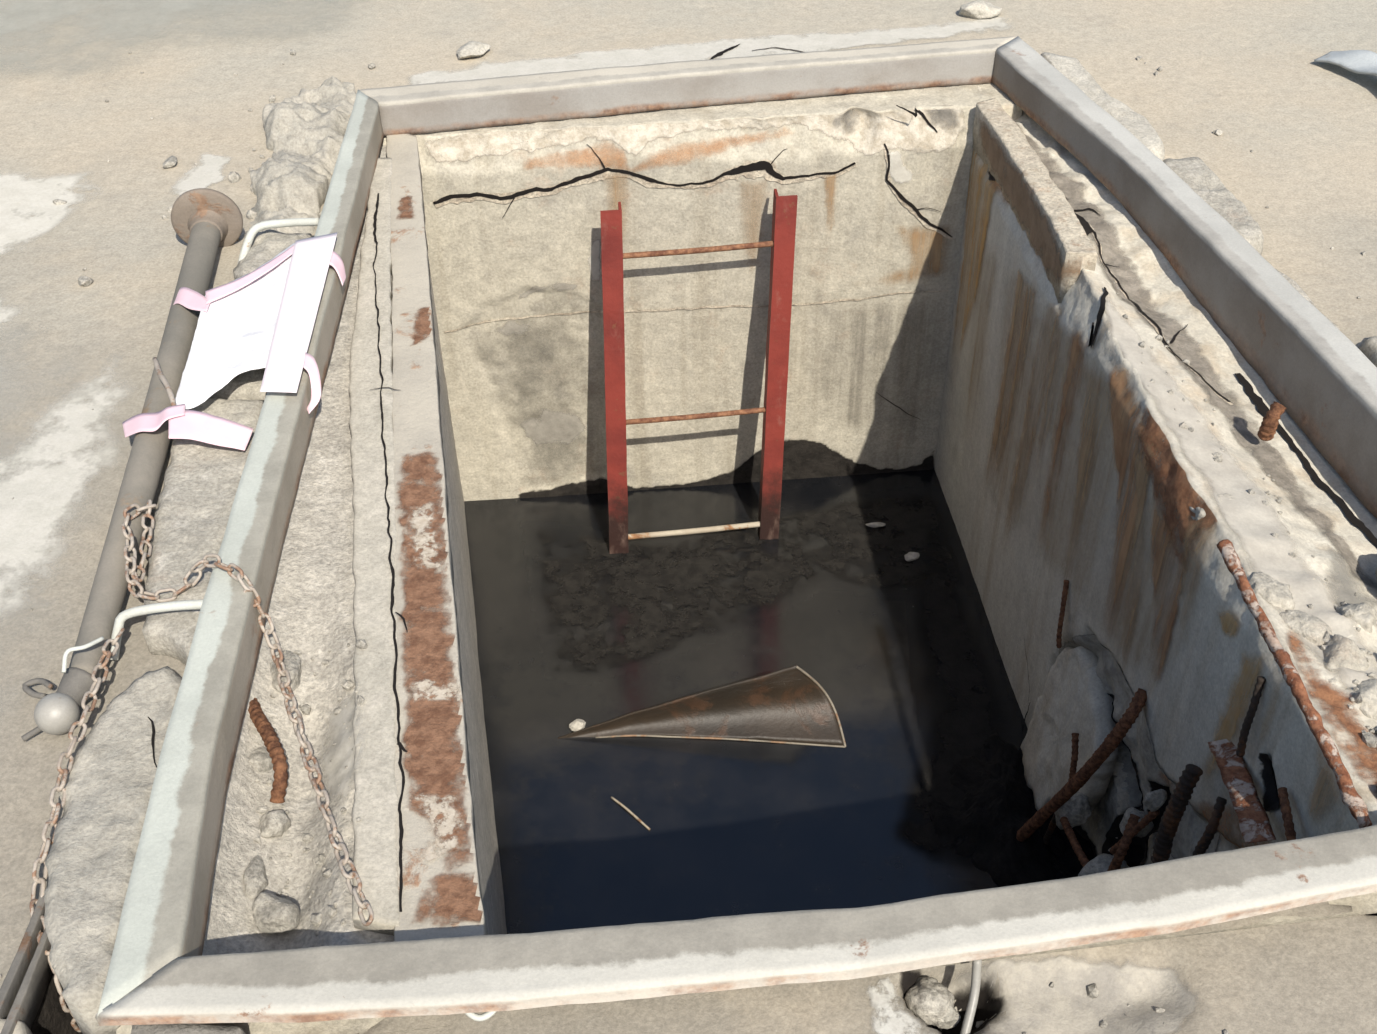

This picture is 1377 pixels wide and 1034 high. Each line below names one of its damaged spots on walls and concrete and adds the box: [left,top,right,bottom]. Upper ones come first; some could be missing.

crack [433,144,953,240]
spalling [425,105,966,162]
crack [896,105,937,133]
rust [957,125,1081,334]
crack [1074,208,1377,546]
crack [371,193,408,912]
rust [1042,333,1217,672]
rust [398,452,483,924]
peeling [1016,580,1227,871]
spalling [1236,676,1296,841]
spalling [869,956,1197,1034]